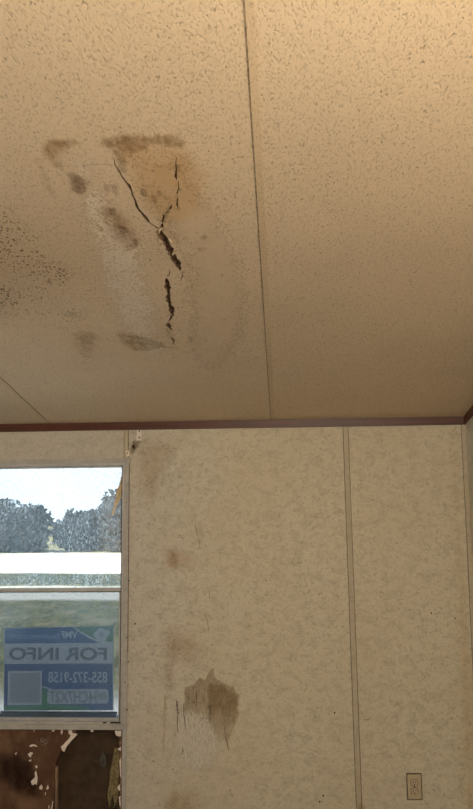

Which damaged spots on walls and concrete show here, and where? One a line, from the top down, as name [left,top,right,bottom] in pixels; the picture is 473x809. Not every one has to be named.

crack [112,157,183,350]
spalling [28,730,122,809]